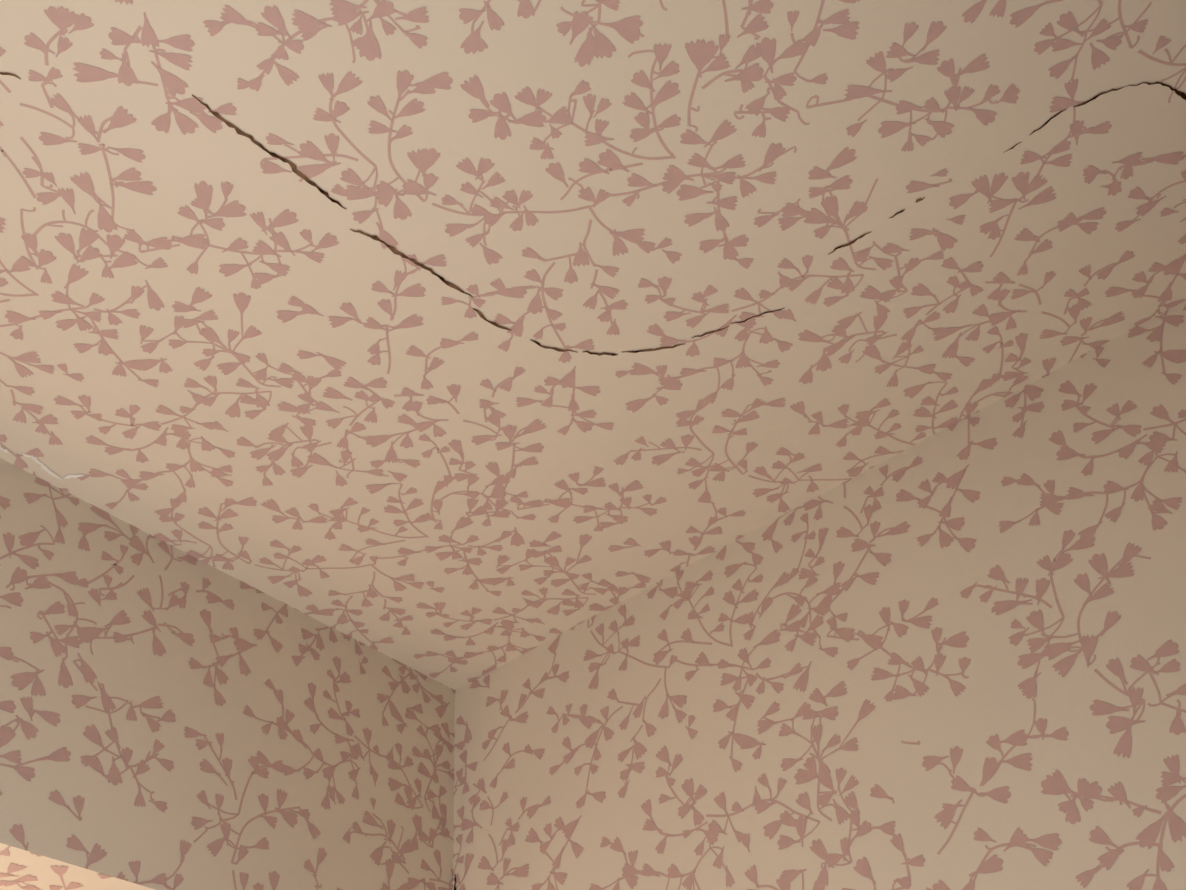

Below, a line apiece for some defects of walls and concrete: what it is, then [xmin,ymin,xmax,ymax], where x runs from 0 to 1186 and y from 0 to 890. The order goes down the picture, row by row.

crack [1004,81,1186,153]
crack [192,95,784,356]
crack [828,197,925,255]